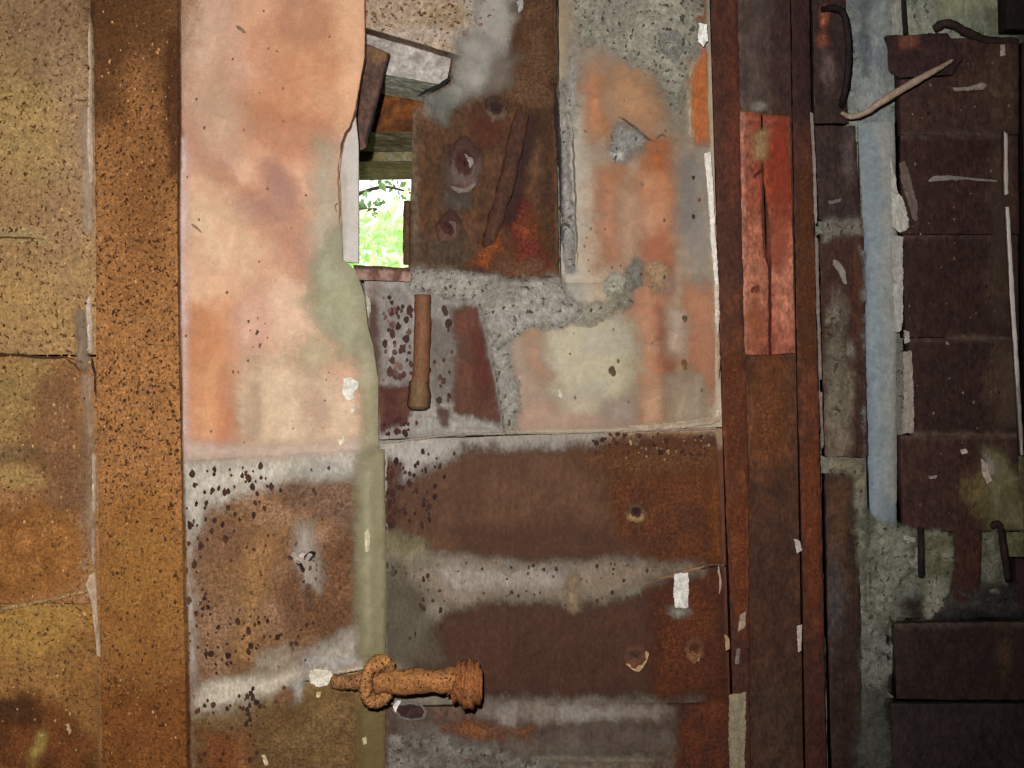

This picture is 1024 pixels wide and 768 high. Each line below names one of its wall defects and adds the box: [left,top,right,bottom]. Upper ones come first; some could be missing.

rust [820,12,829,39]
rust [753,118,788,202]
rust [370,303,379,359]
crack [0,352,97,396]
rust [379,385,412,432]
rust [387,47,729,768]
damp [181,139,707,768]
rust [106,476,360,683]